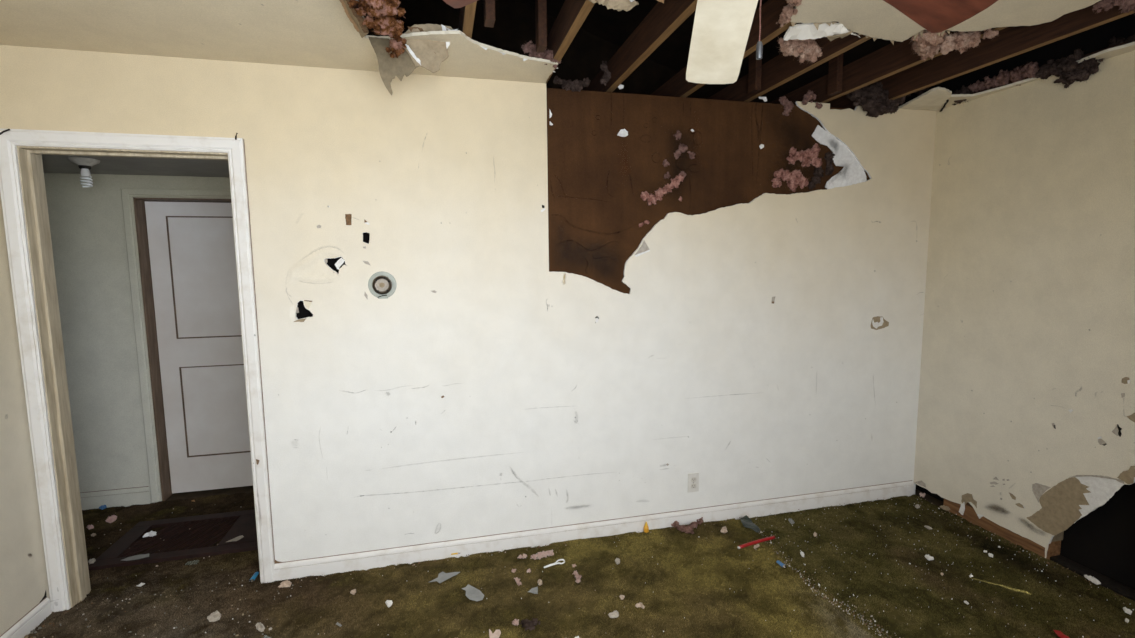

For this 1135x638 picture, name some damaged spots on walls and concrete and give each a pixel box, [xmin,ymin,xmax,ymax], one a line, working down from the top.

peeling [589,0,639,11]
peeling [783,6,894,45]
peeling [339,0,458,95]
peeling [899,88,952,112]
peeling [812,125,867,189]
spalling [345,214,371,266]
spalling [324,257,347,274]
spalling [289,300,313,322]
spalling [871,316,889,330]
peeling [1098,413,1135,446]
spalling [959,493,984,519]
peeling [1009,466,1135,536]